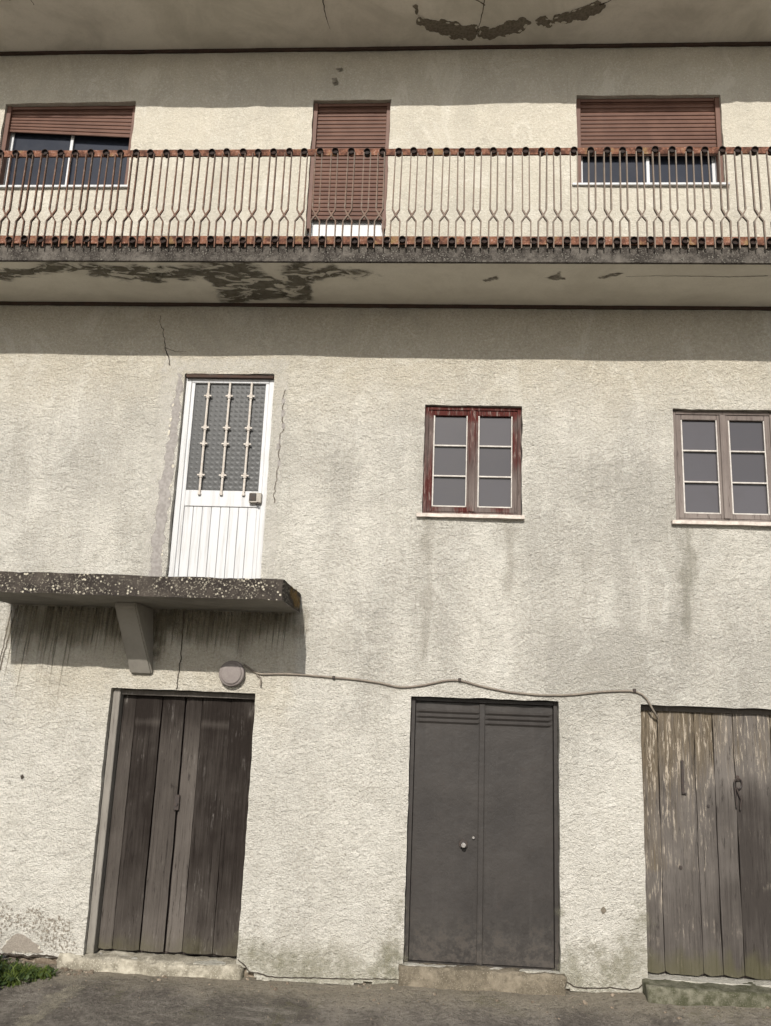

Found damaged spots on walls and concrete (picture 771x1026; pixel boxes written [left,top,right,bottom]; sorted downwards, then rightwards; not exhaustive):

peeling [413,0,611,41]
crack [160,316,186,366]
crack [273,390,286,503]
leakage [8,605,122,658]
leakage [153,609,294,655]
peeling [0,901,77,954]